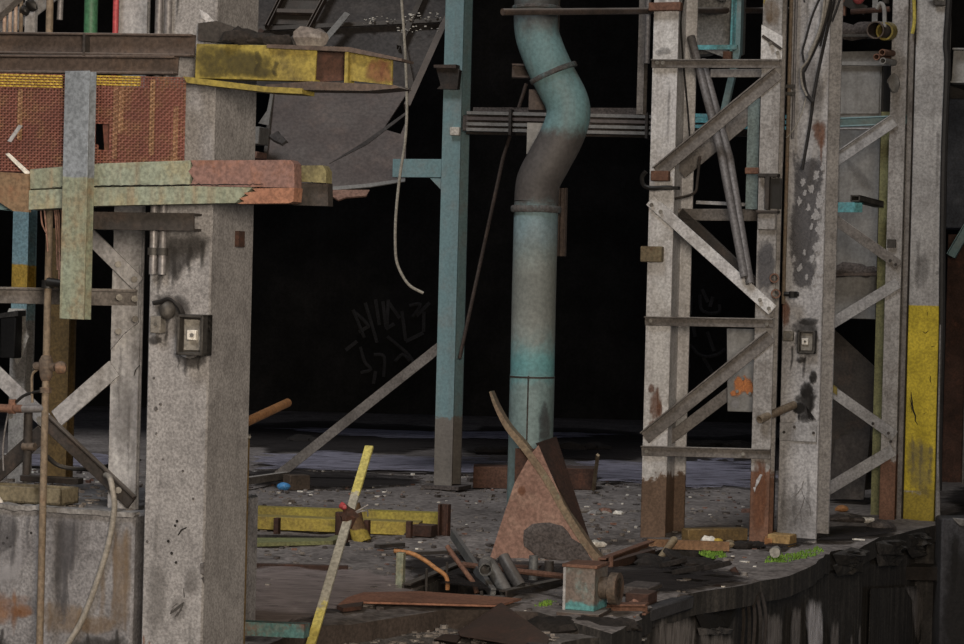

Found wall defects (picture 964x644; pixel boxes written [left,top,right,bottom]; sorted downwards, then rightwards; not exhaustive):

peeling [790,159,825,287]
rust [649,385,662,424]
water stain [83,623,119,644]